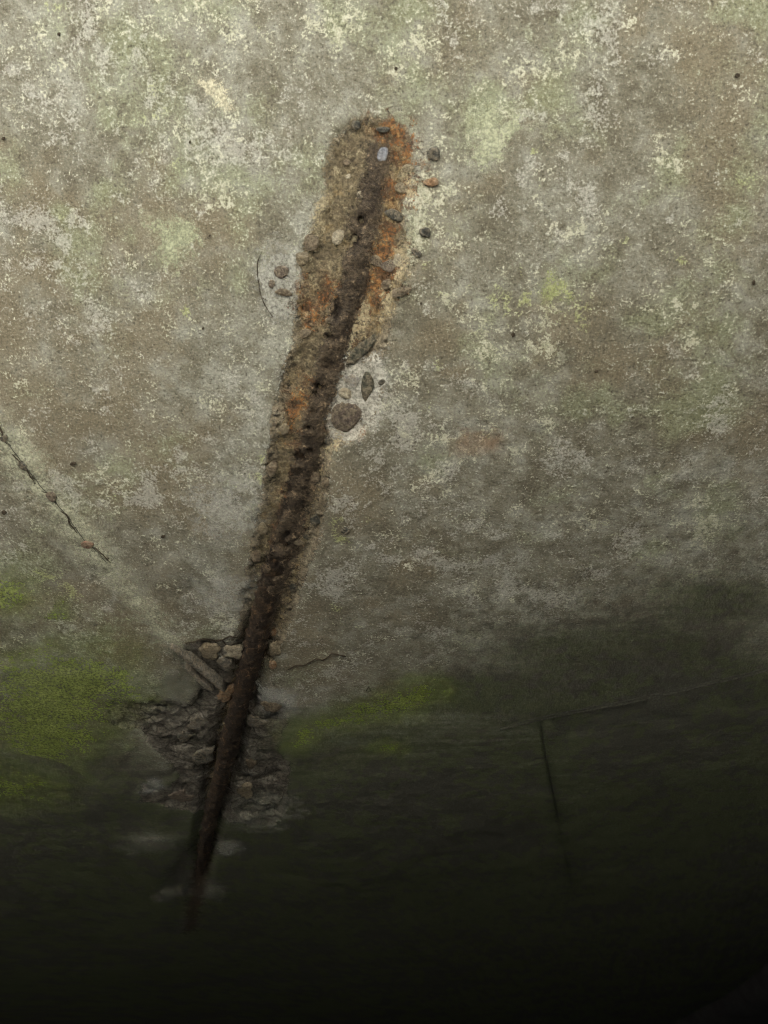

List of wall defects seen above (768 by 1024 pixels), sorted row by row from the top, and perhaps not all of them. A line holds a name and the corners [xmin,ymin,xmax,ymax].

crack [0,424,111,563]
spalling [103,115,395,813]
rust [204,107,430,799]
crack [288,653,346,670]
spalling [220,161,439,826]
spalling [427,146,440,161]